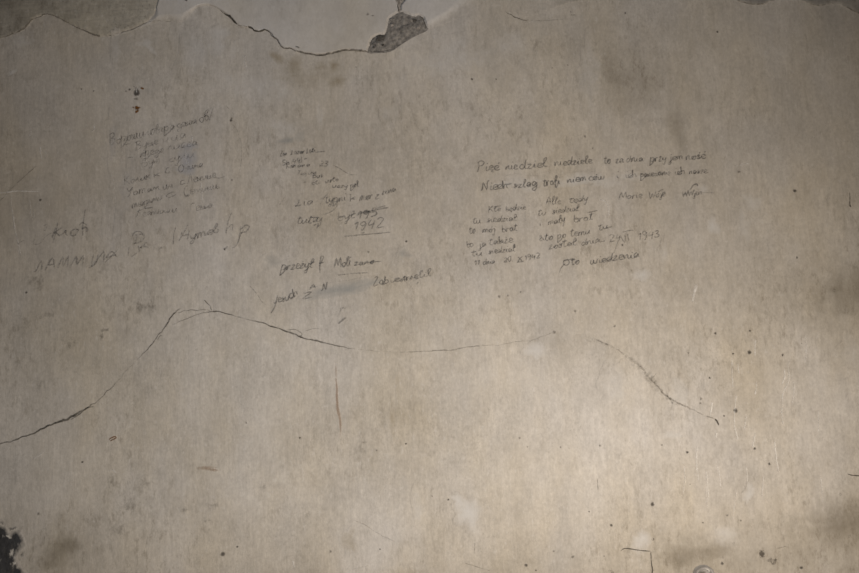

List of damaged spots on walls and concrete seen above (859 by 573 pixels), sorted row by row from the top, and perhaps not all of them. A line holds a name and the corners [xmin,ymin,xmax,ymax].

flaking render [367,0,429,53]
crack [4,394,105,443]
peeling [0,509,28,573]